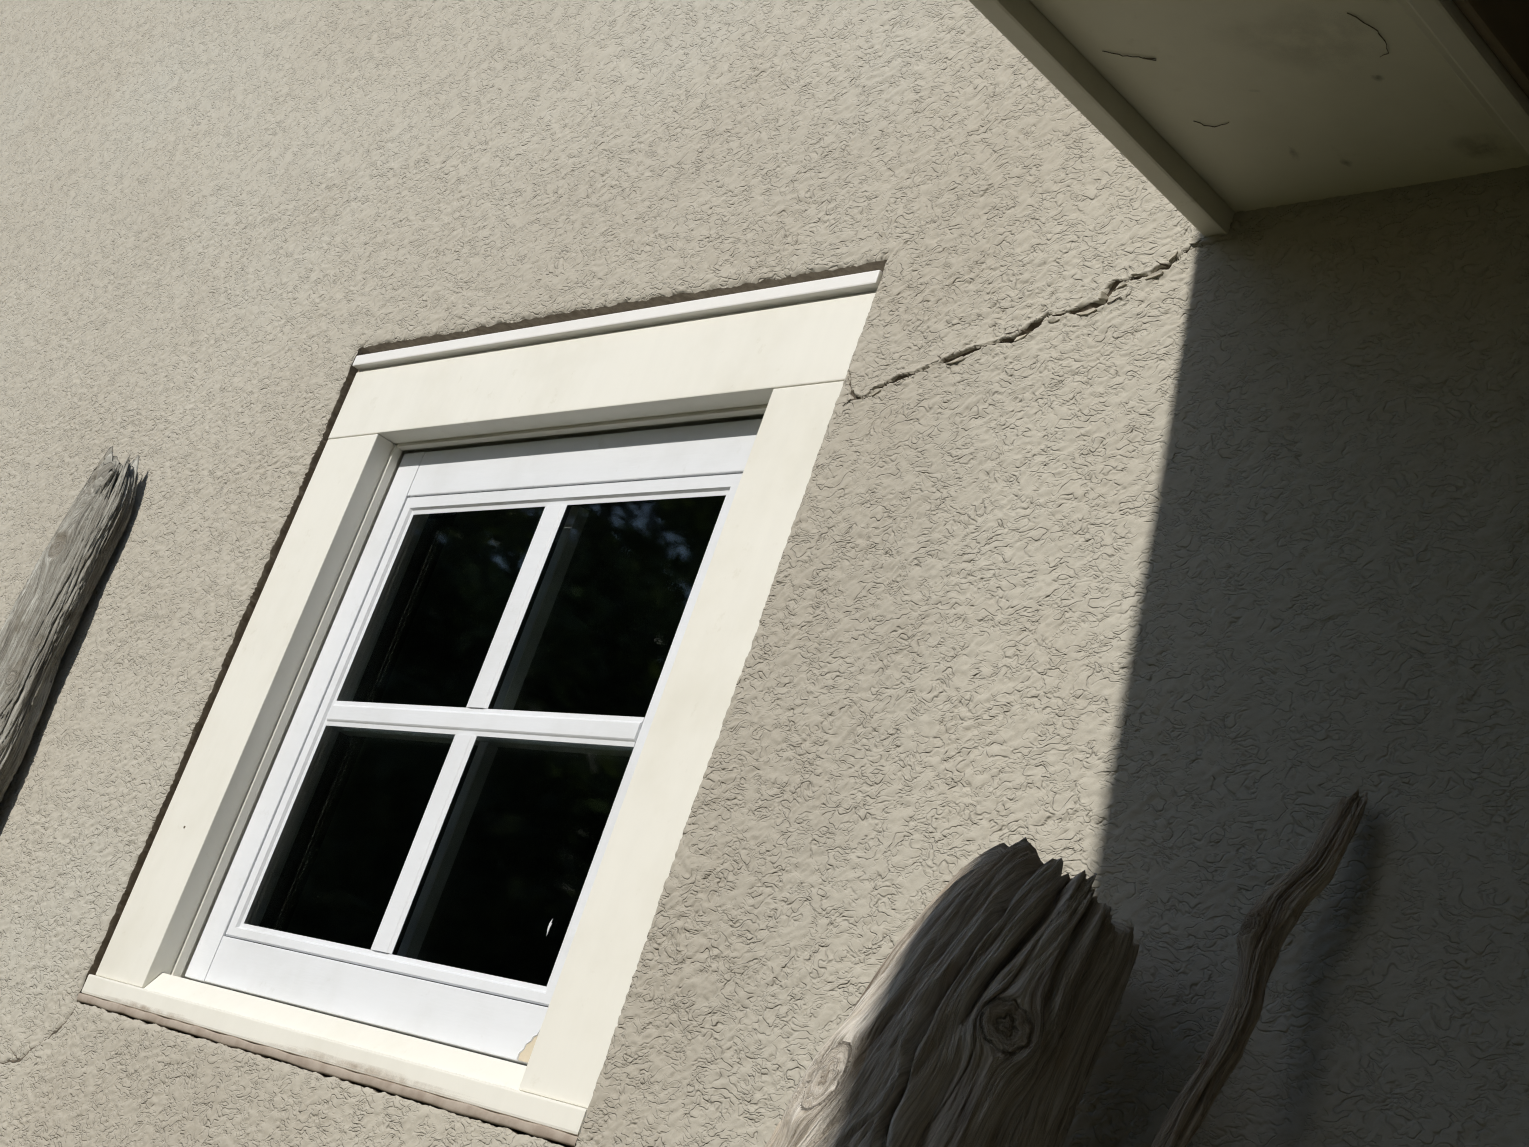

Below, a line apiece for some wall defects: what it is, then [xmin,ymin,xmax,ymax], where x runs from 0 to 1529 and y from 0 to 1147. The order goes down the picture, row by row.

crack [843,238,1203,406]